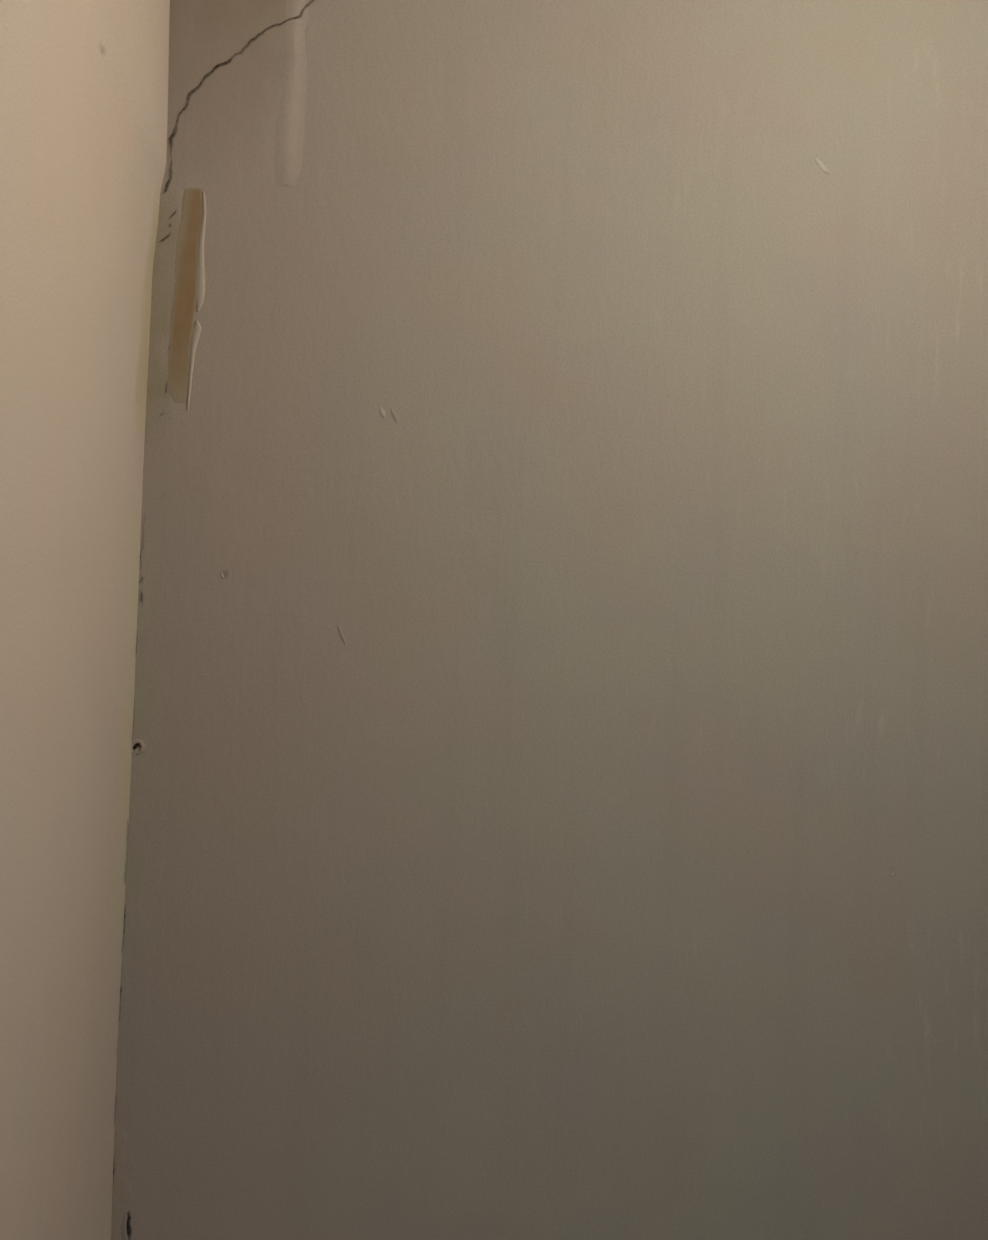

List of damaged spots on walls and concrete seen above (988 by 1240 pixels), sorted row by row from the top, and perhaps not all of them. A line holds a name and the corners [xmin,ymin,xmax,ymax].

crack [165,0,313,191]
peeling [167,187,206,410]